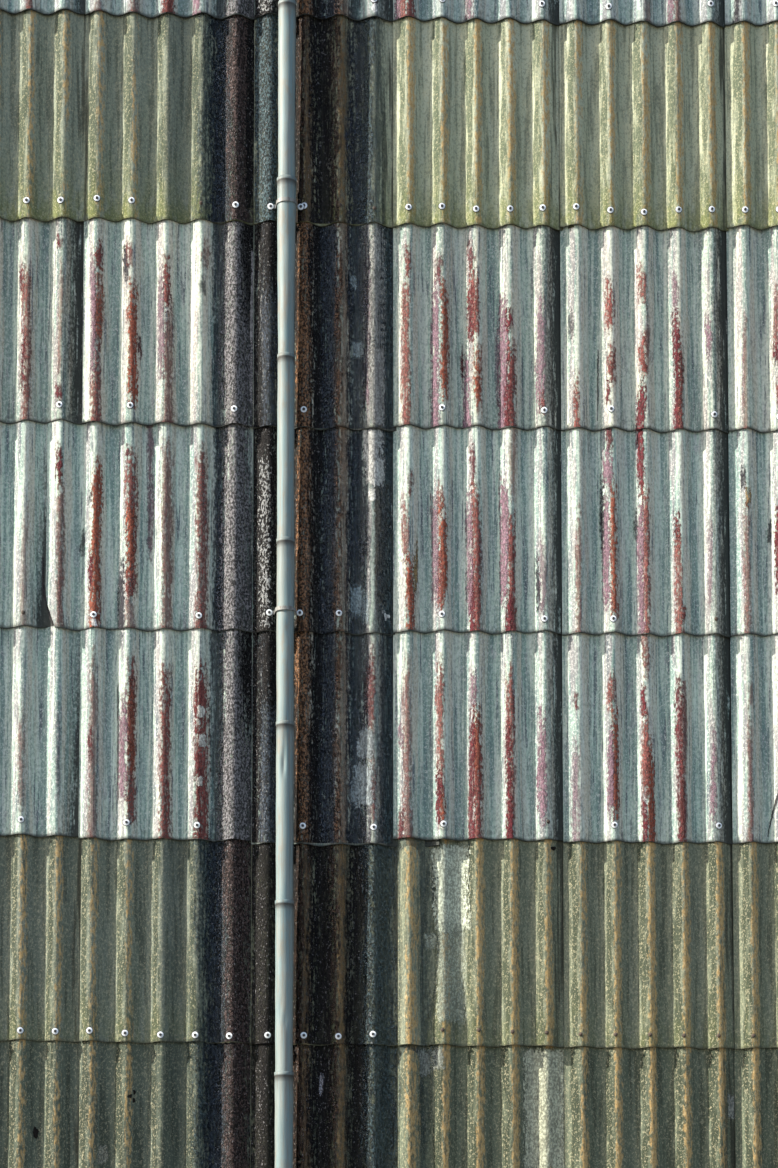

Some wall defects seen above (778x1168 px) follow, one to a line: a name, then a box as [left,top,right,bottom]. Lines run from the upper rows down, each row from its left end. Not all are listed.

corrosion [90,238,105,422]
corrosion [55,442,65,626]
corrosion [79,456,104,628]
corrosion [117,243,174,629]
leakage [191,0,279,1168]
leakage [293,0,398,1168]
corrosion [401,470,448,630]
corrosion [498,472,517,631]
corrosion [599,428,620,618]
corrosion [633,325,657,842]
corrosion [192,659,211,840]
corrosion [606,672,620,821]